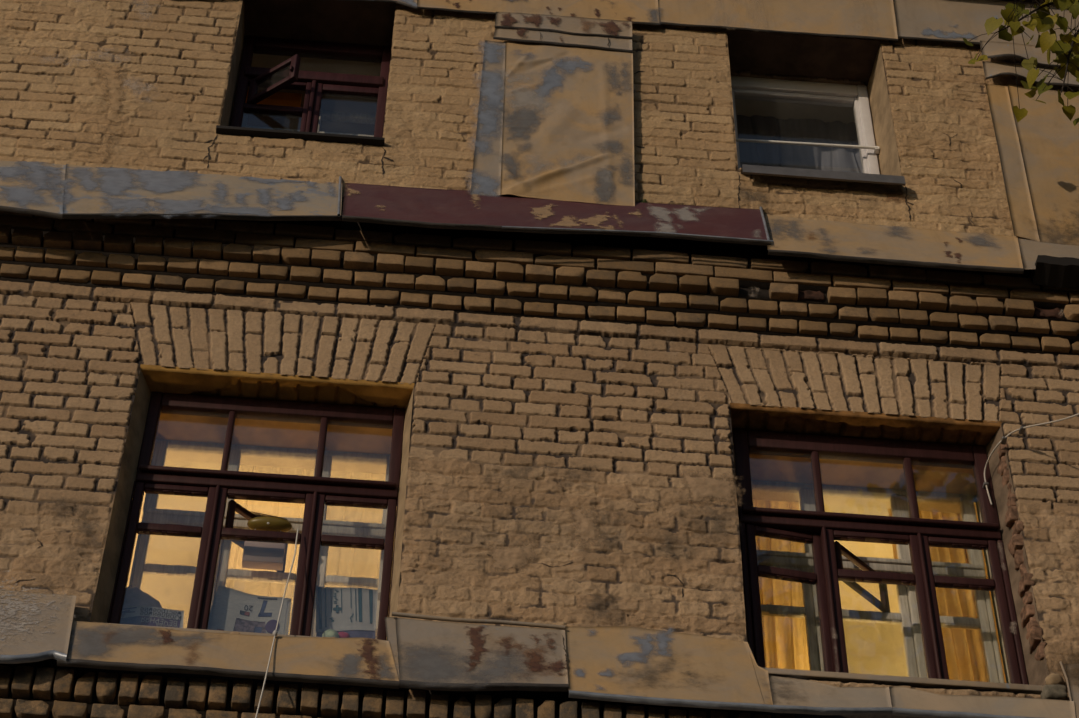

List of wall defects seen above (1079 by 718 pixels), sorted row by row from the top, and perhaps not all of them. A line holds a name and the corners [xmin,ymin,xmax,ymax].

peeling [473,42,540,153]
peeling [534,58,591,97]
crack [203,136,217,169]
peeling [0,161,334,216]
peeling [470,154,519,209]
peeling [531,204,704,232]
corrosion [357,639,379,680]
corrosion [466,626,488,670]
corrosion [523,634,567,675]
peeling [618,628,673,665]